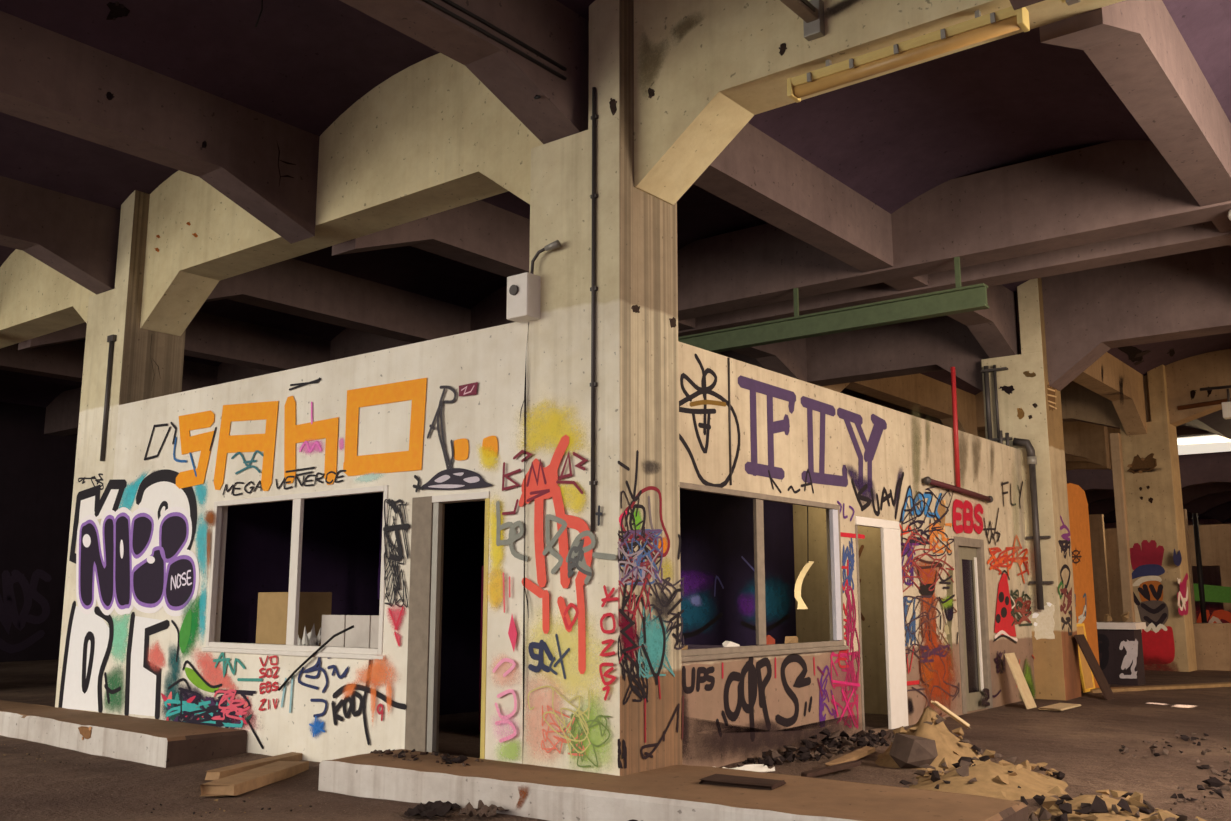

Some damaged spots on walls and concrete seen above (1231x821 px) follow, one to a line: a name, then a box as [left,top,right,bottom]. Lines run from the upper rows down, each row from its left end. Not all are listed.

leakage [914,421,930,484]
leakage [959,441,994,477]